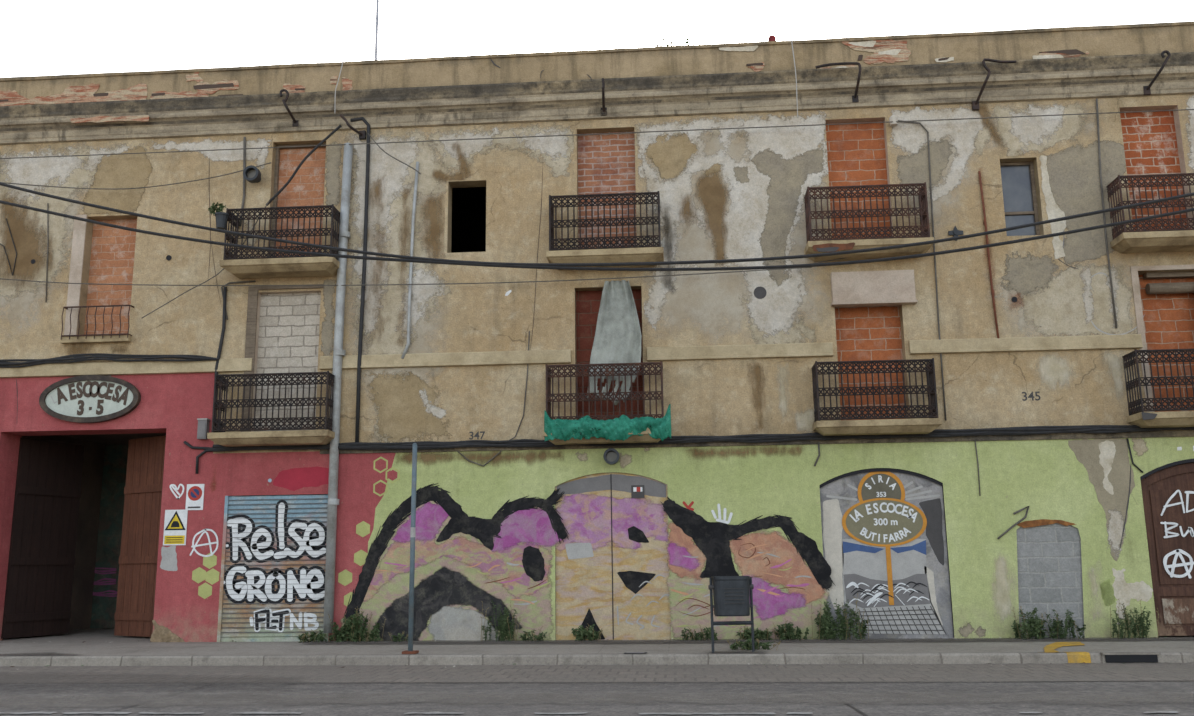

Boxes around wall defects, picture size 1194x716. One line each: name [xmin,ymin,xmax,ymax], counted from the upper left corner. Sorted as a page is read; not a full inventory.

flaking render [70,115,149,123]
flaking render [0,72,243,106]
flaking render [820,39,911,69]
peeling [1185,95,1194,169]
peeling [0,138,272,302]
peeling [325,123,574,355]
leakage [643,132,752,334]
peeling [635,111,830,339]
leakage [788,185,826,316]
peeling [891,103,1138,337]
peeling [367,371,450,442]
peeling [1068,438,1153,624]